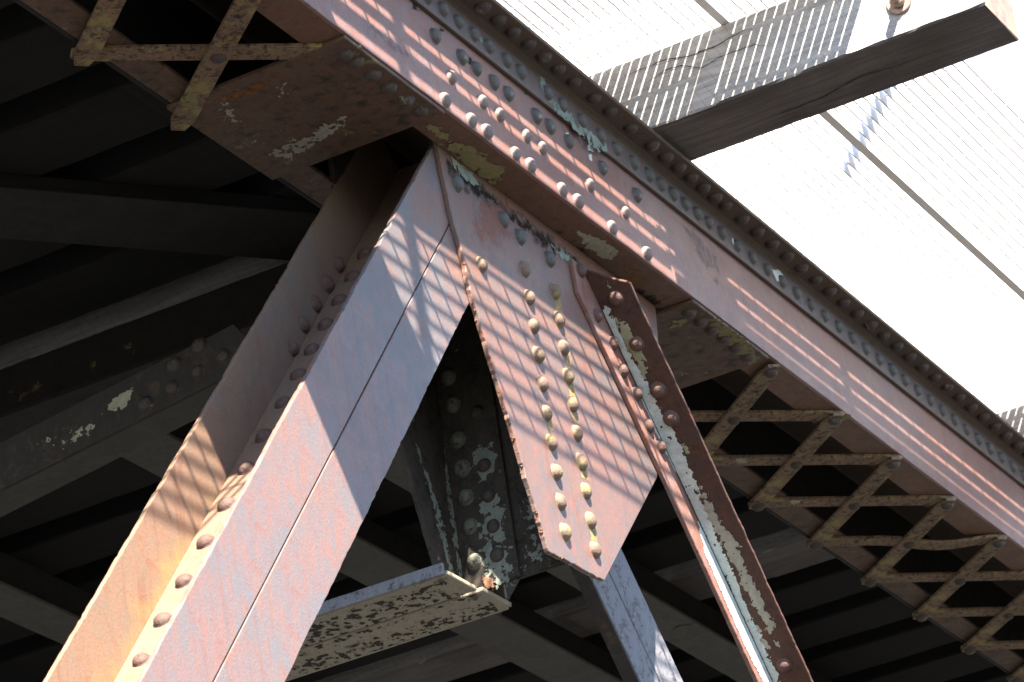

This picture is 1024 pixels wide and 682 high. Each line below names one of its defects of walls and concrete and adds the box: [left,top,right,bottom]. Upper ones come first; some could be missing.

crack [622,25,771,84]
peeling [246,116,348,160]
peeling [425,124,510,185]
peeling [576,230,619,260]
peeling [107,388,134,411]
peeling [37,424,95,449]
peeling [603,306,781,682]
peeling [287,582,498,679]